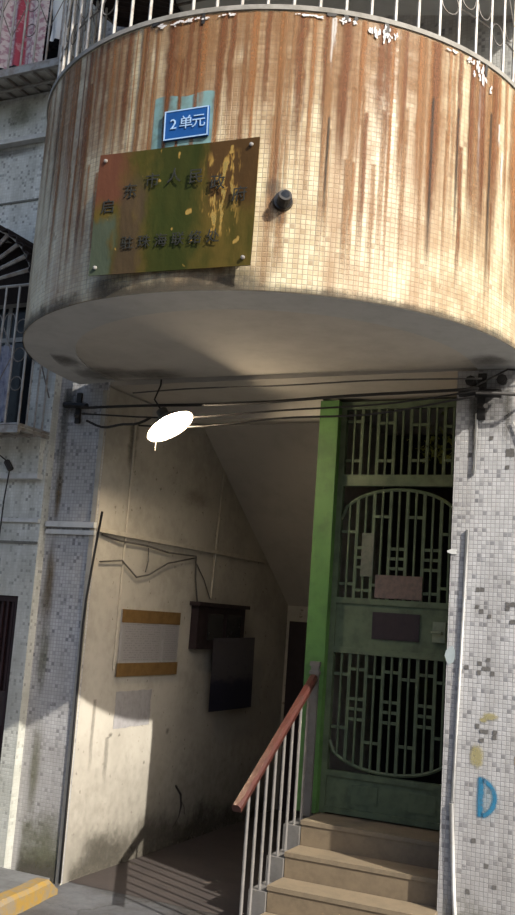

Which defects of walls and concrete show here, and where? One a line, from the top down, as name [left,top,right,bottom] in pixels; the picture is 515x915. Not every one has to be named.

peeling [152,13,236,29]
peeling [295,12,358,25]
peeling [368,23,399,45]
peeling [467,57,492,94]
corrosion [43,11,515,264]
leakage [70,802,261,880]